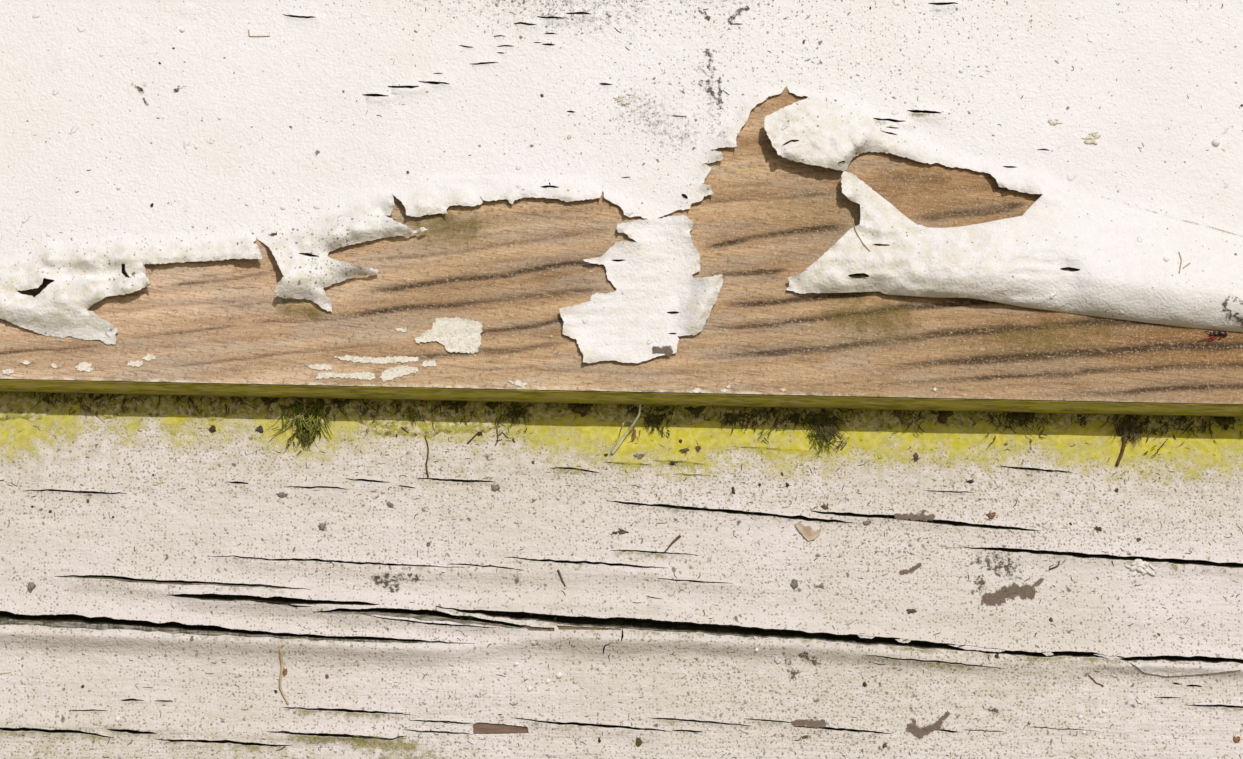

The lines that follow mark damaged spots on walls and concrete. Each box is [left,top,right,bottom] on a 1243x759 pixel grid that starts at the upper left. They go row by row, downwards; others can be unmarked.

peeling [0,86,1243,363]
peeling [308,317,483,382]
peeling [75,362,93,372]
peeling [126,354,156,367]
crack [734,444,781,452]
crack [552,460,711,476]
crack [1000,465,1071,473]
crack [611,490,1243,569]
crack [0,550,1243,708]